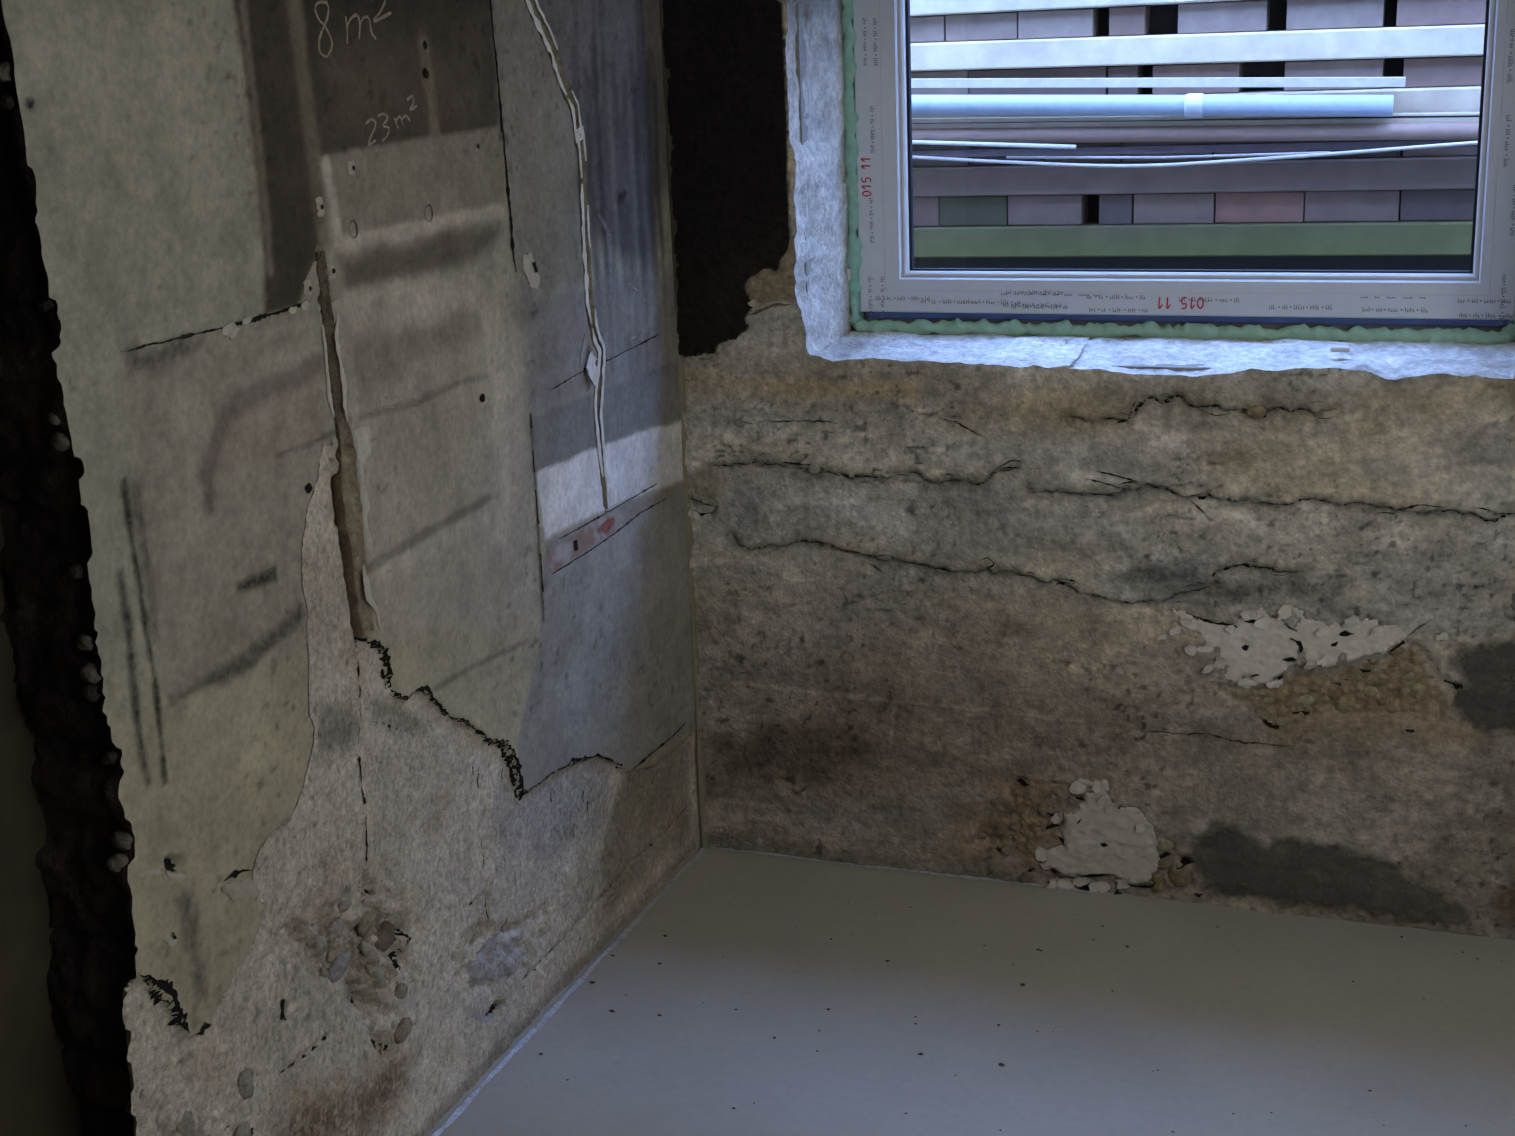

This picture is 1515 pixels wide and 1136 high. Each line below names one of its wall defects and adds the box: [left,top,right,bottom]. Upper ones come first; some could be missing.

spalling [746,238,796,316]
crack [530,326,1337,622]
crack [715,418,1515,522]
spalling [122,259,699,1136]
spalling [1157,603,1463,732]
peeling [970,777,1204,898]